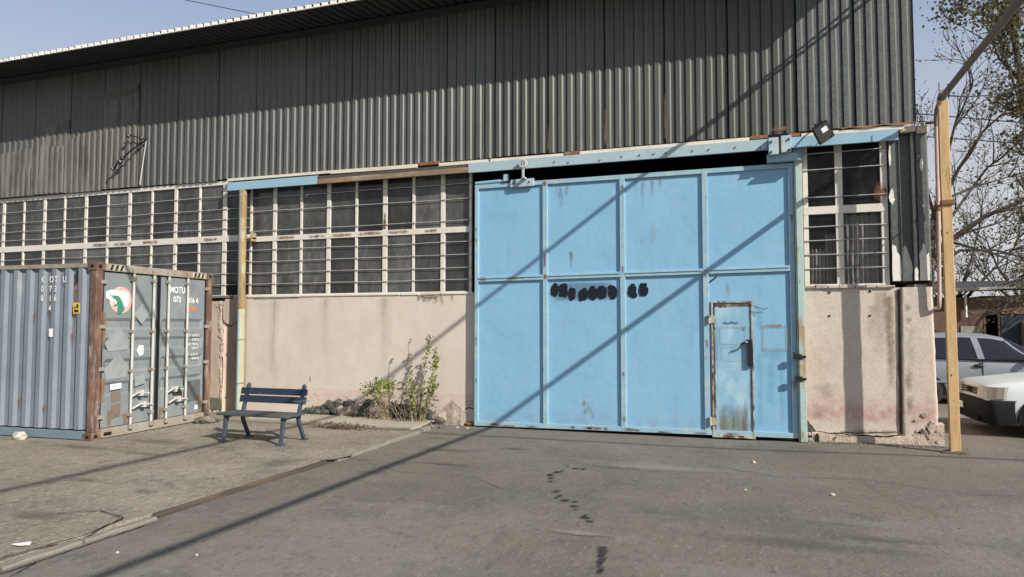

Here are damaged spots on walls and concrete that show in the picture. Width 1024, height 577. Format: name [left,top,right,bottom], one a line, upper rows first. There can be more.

rust [700,304,751,435]
spalling [913,413,942,444]